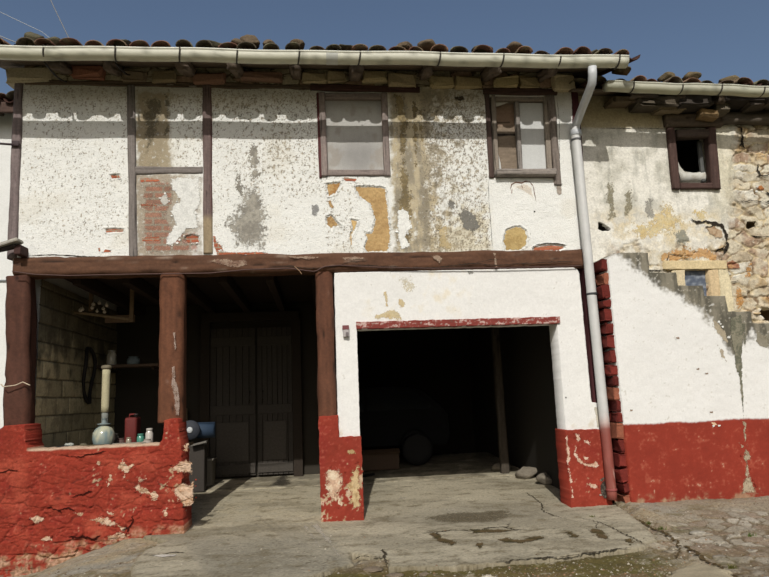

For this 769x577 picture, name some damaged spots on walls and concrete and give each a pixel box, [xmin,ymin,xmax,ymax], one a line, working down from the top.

leakage [144,94,171,147]
leakage [394,94,425,220]
peeling [141,176,201,246]
leakage [224,143,270,249]
spalling [325,176,412,253]
leakage [448,200,479,231]
crack [692,219,738,282]
crack [47,491,92,512]
peeling [169,443,197,506]
peeling [322,449,364,512]
crack [69,534,100,542]
crack [496,517,749,577]